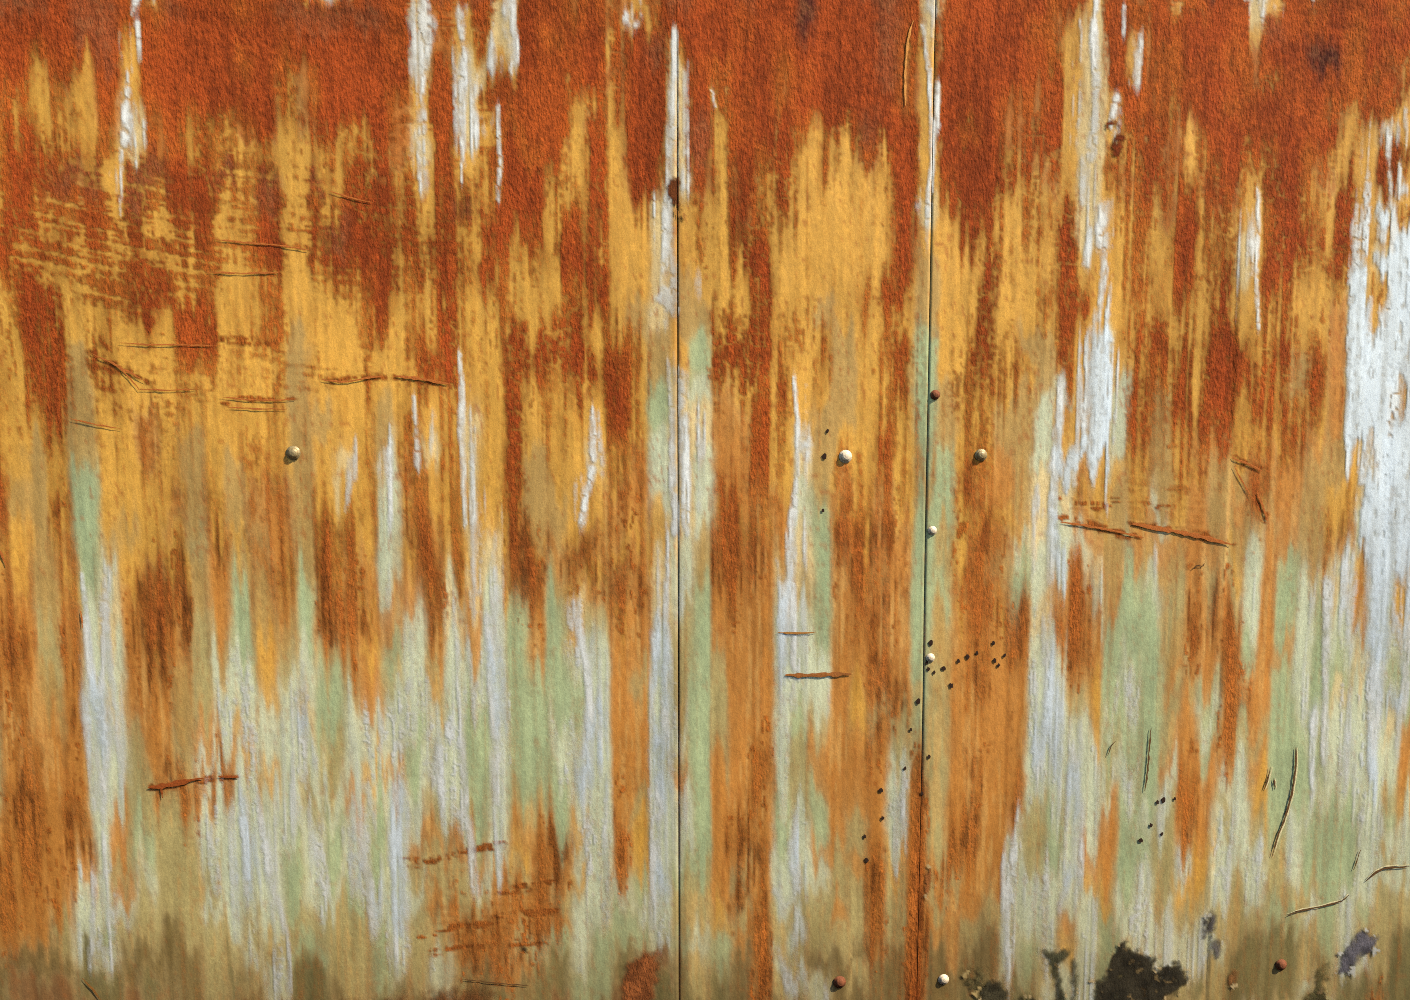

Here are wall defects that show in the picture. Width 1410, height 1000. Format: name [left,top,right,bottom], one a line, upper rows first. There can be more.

rust [0,0,1092,775]
rust [1057,0,1410,540]
rust [0,598,92,931]
rust [148,754,238,821]
rust [403,816,572,1000]
rust [617,829,632,894]
rust [623,953,660,1000]
rust [726,716,773,1000]
rust [865,742,989,1000]
rust [1185,563,1251,776]